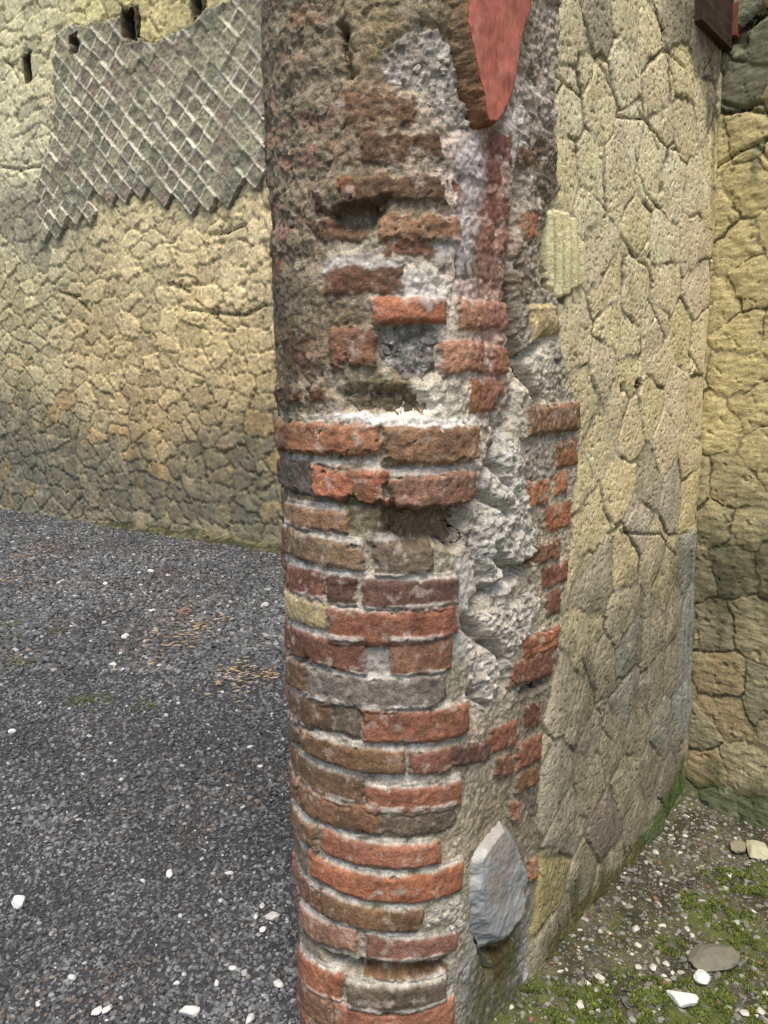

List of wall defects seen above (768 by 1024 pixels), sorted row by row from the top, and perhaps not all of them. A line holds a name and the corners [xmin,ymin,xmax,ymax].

spalling [69,31,80,55]
spalling [120,6,141,46]
flaking render [381,0,532,130]
spalling [265,0,348,272]
peeling [35,194,84,244]
spalling [329,203,385,231]
spalling [342,324,443,415]